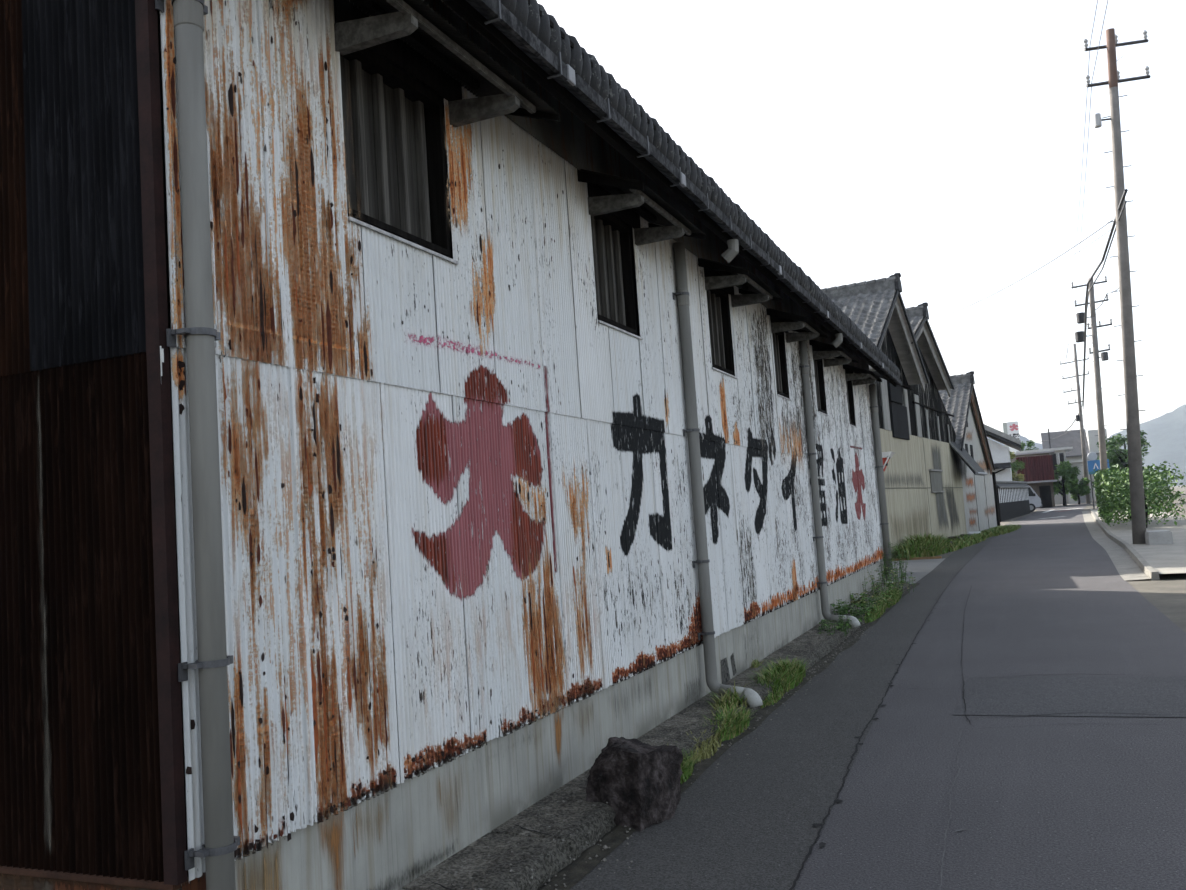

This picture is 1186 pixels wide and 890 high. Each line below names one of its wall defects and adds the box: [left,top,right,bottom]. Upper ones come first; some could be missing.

rust [471,234,496,354]
rust [204,0,487,890]
rust [719,378,740,446]
rust [779,424,803,461]
rust [501,469,703,755]
rust [743,546,884,624]
rust [182,872,206,890]